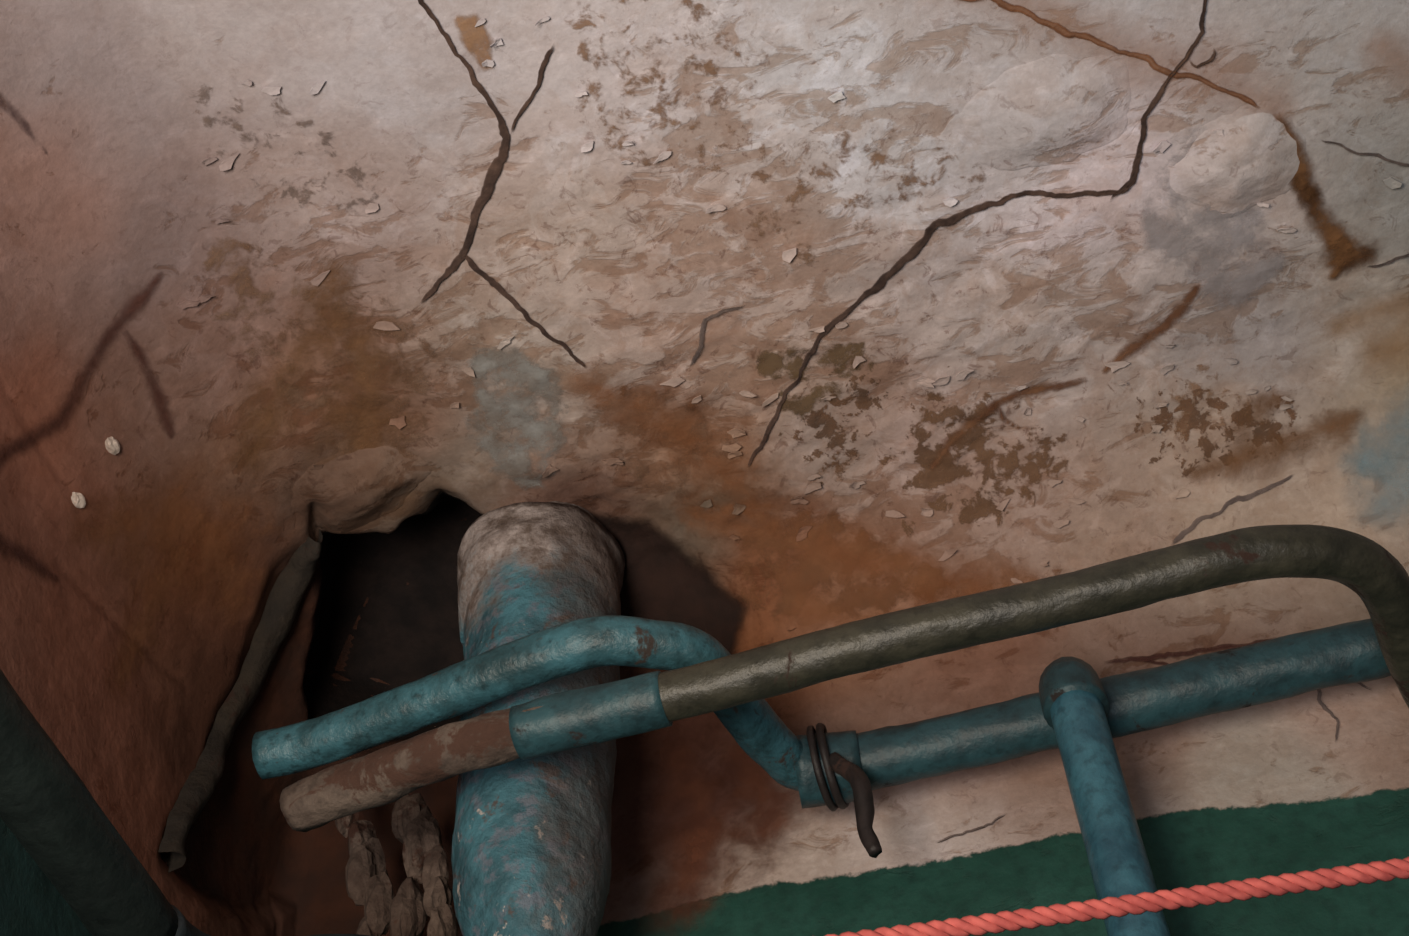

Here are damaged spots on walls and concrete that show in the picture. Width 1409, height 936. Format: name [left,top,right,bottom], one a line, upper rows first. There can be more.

peeling [456,16,504,68]
peeling [573,15,697,130]
peeling [660,0,726,105]
crack [418,0,585,367]
peeling [786,131,888,205]
crack [748,0,1258,469]
corrosion [1276,117,1376,279]
crack [1324,141,1409,167]
crack [1371,254,1409,268]
peeling [1134,344,1305,499]
crack [1173,475,1292,543]
spalling [158,491,482,936]